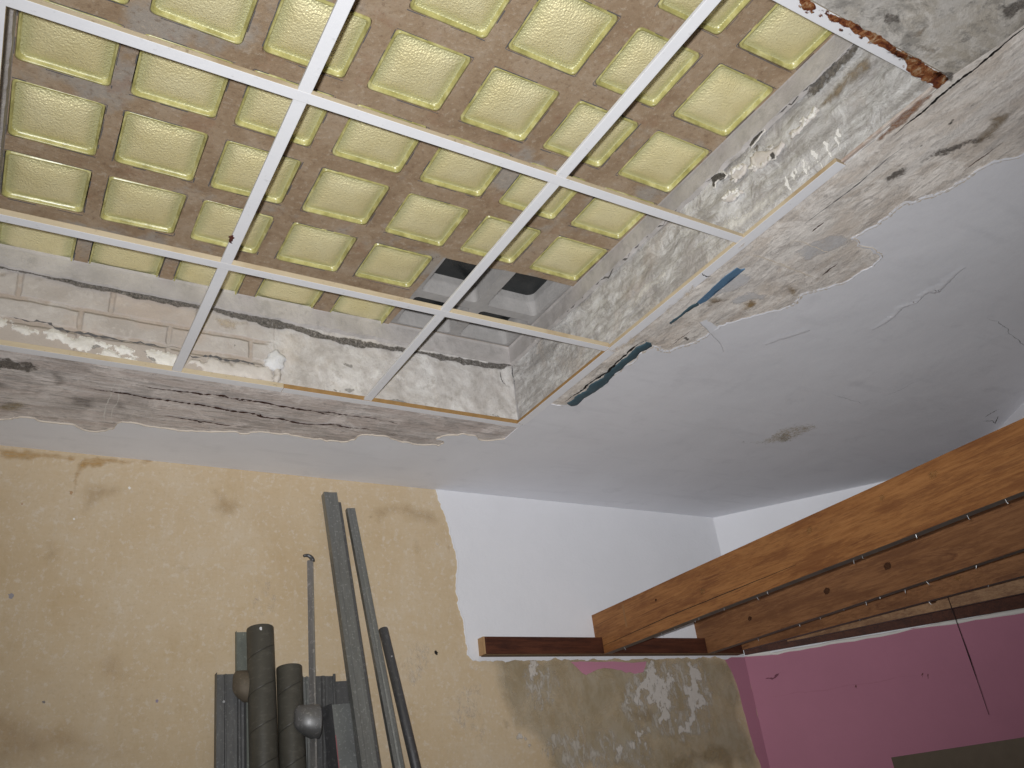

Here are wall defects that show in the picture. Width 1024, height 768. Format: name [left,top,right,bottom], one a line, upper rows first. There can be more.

rust [798,0,949,140]
flaking render [552,25,1024,406]
crack [14,317,262,366]
crack [86,378,402,435]
flaking render [0,350,517,446]
peeling [436,489,731,734]